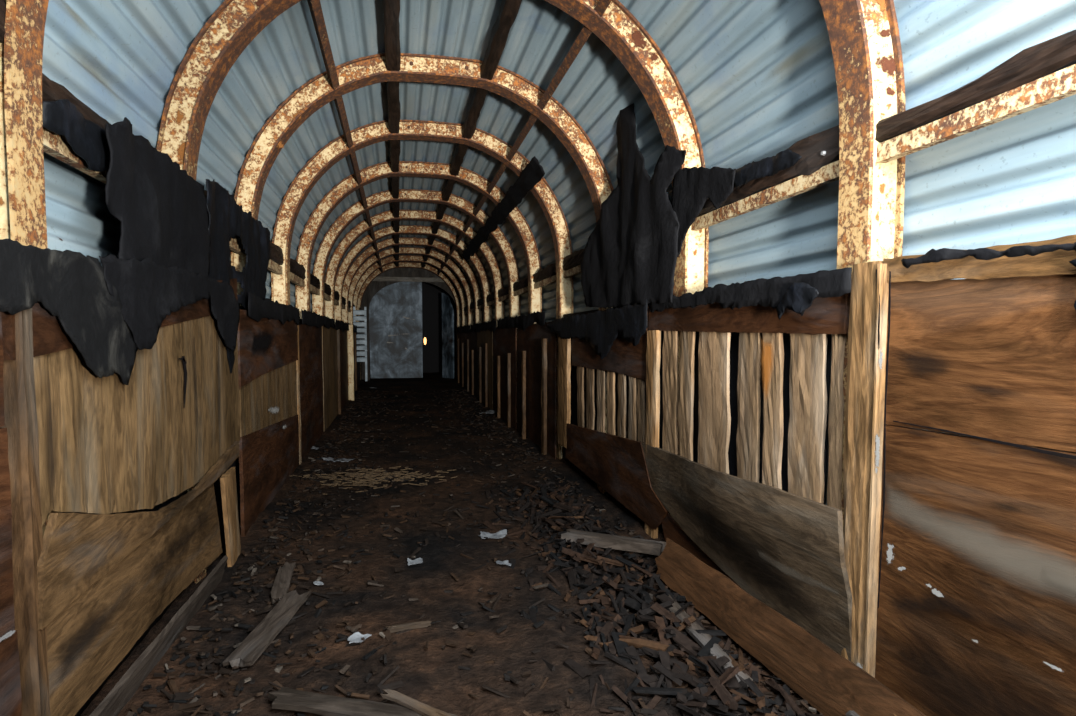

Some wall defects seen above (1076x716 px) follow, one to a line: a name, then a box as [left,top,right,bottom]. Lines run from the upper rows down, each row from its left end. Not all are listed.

corrosion [632,31,659,61]
corrosion [876,53,896,95]
crack [876,269,1076,608]